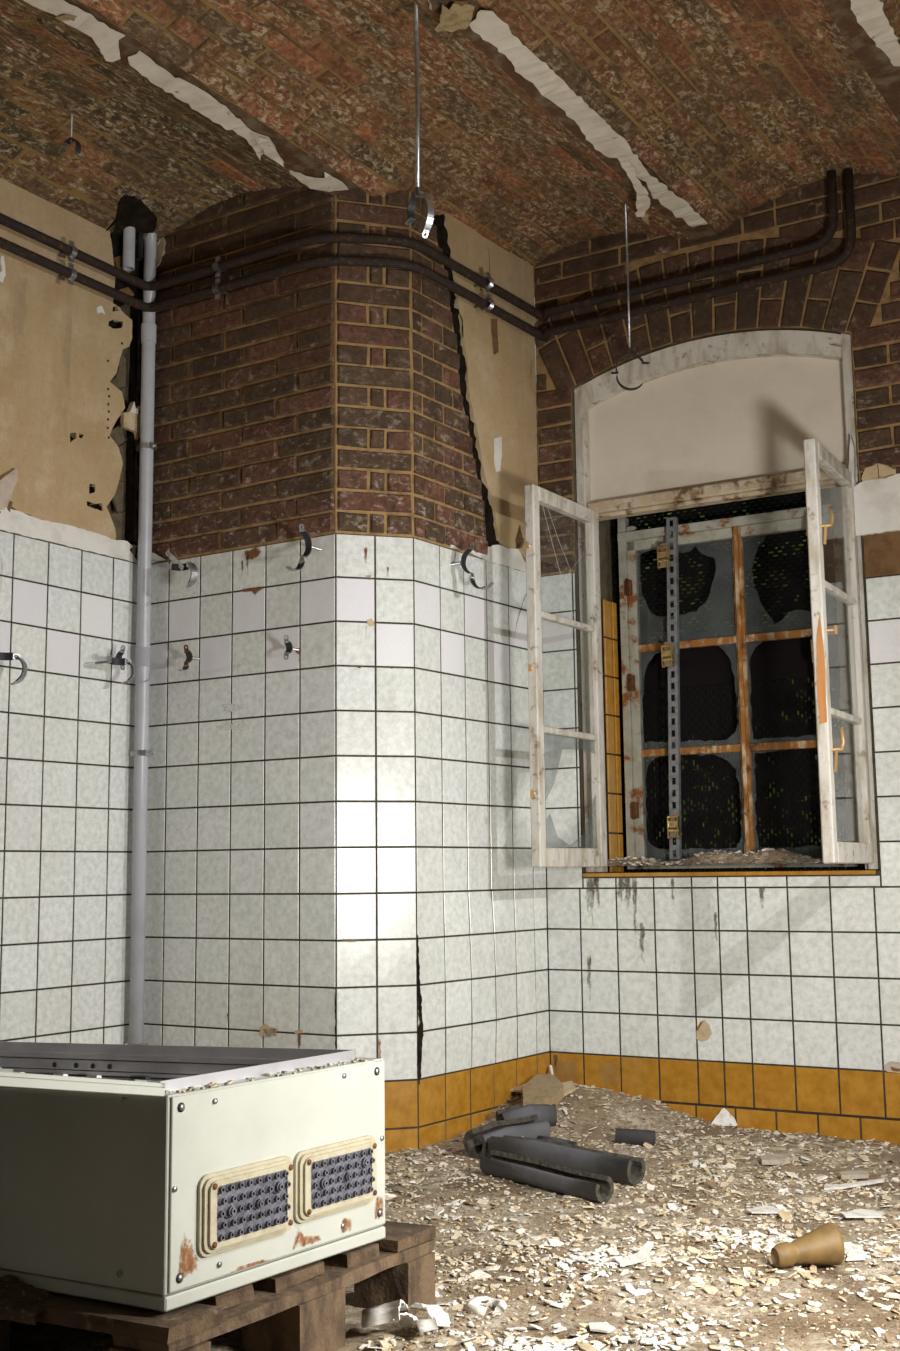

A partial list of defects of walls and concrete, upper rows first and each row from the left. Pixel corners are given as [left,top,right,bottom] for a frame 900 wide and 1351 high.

peeling [24,0,348,192]
peeling [428,0,708,227]
peeling [850,0,900,66]
spalling [87,234,166,545]
crack [433,214,499,547]
peeling [0,468,18,513]
crack [416,935,424,1084]